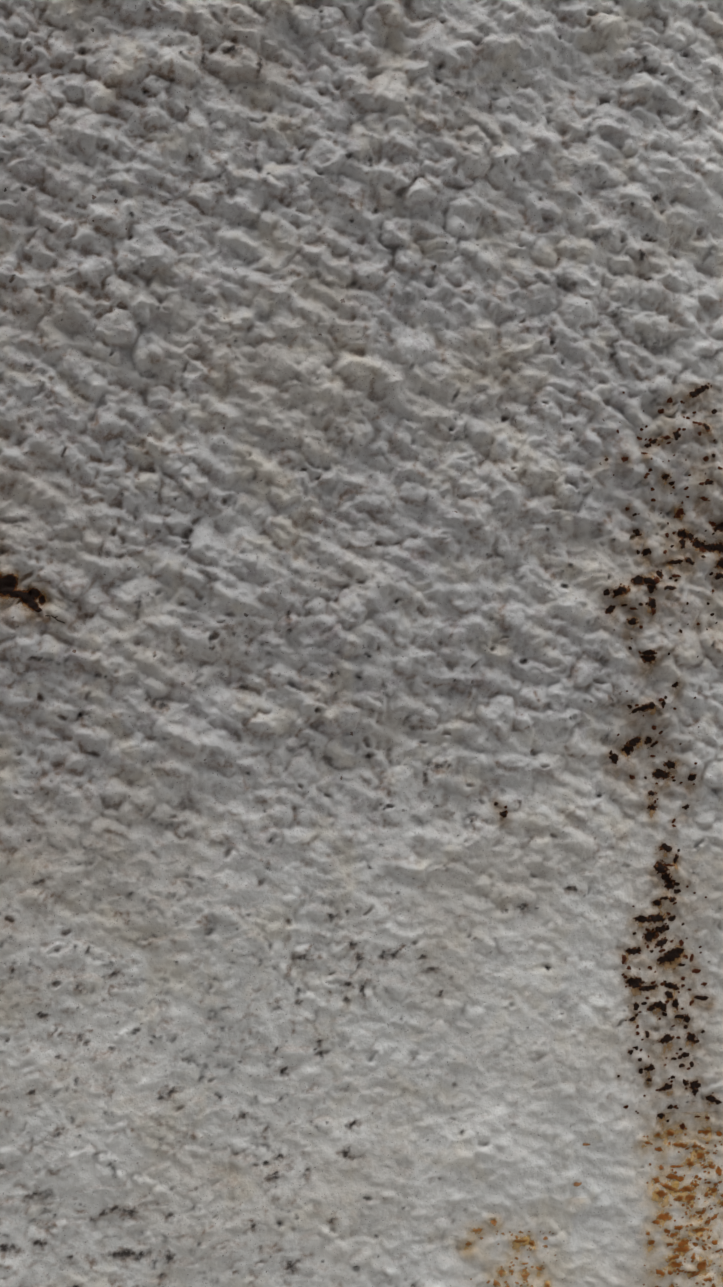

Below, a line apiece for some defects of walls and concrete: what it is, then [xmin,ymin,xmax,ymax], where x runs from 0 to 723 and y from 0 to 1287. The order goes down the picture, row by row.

corrosion [0,571,47,617]
corrosion [603,383,723,673]
corrosion [609,682,697,819]
corrosion [622,843,723,1287]
corrosion [464,1219,563,1287]